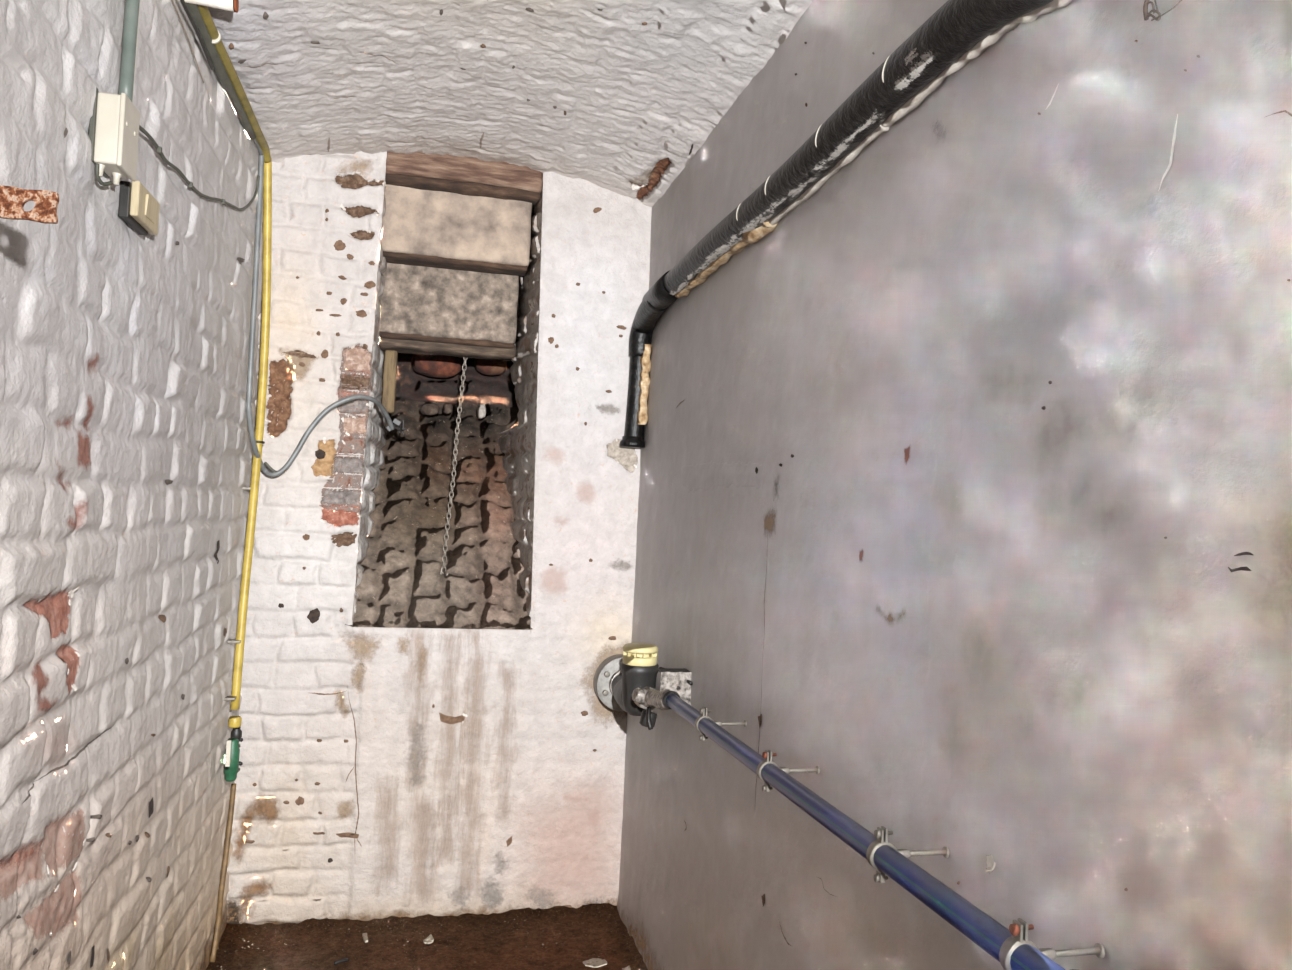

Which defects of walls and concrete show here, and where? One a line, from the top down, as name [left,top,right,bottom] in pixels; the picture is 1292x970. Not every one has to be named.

spalling [630,158,672,200]
spalling [265,350,316,437]
spalling [311,344,374,547]
spalling [23,587,81,694]
leakage [400,641,426,672]
peeling [0,810,86,939]